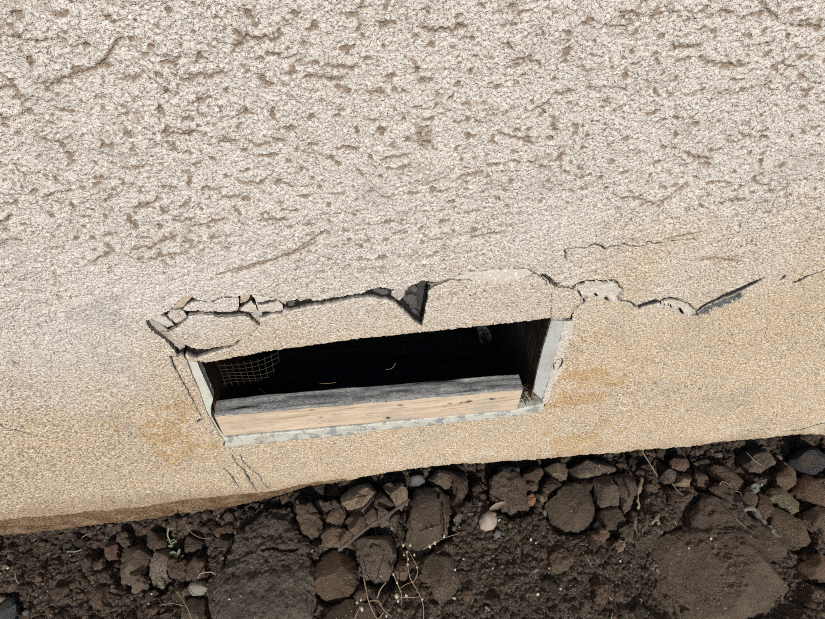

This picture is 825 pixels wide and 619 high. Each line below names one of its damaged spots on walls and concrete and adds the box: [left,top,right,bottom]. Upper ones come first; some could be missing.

spalling [149,294,309,350]
spalling [373,280,427,315]
crack [427,267,825,318]
crack [169,356,202,424]
crack [223,454,269,491]